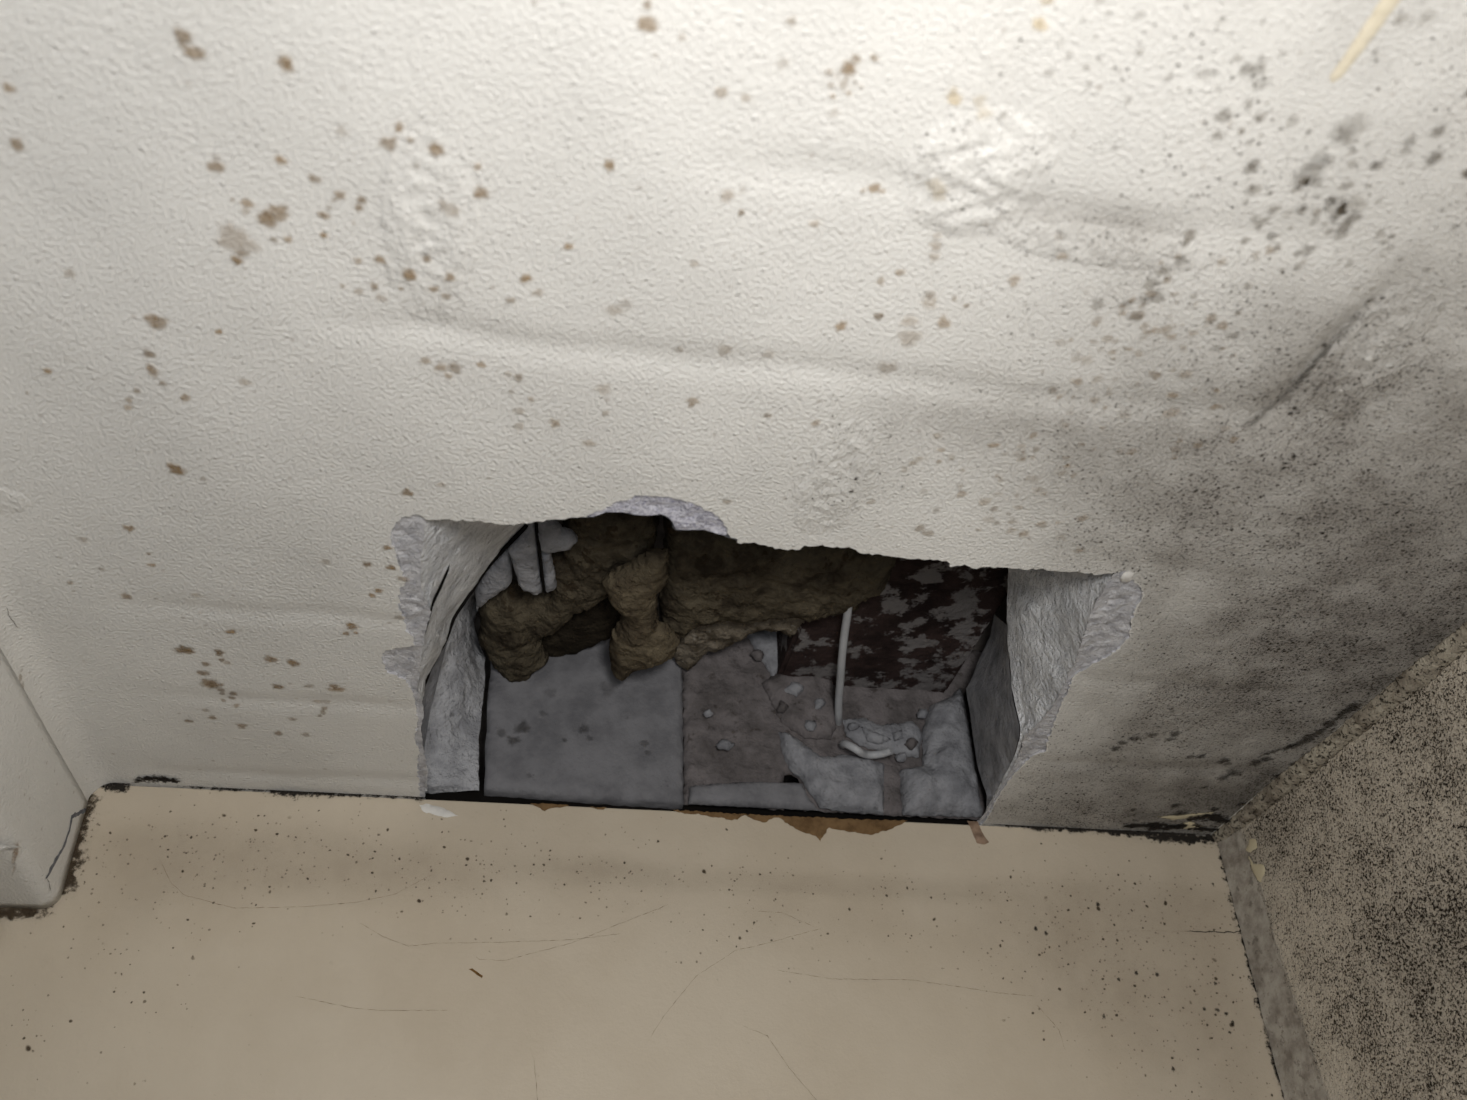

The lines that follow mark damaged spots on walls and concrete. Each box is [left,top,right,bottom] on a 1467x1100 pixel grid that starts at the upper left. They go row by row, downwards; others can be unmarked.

damp [1186,77,1365,231]
flaking render [574,495,737,541]
damp [176,646,236,698]
spalling [382,514,526,800]
damp [189,170,1467,1100]
peeling [904,738,918,750]
spalling [966,568,1142,825]
peeling [674,810,907,841]